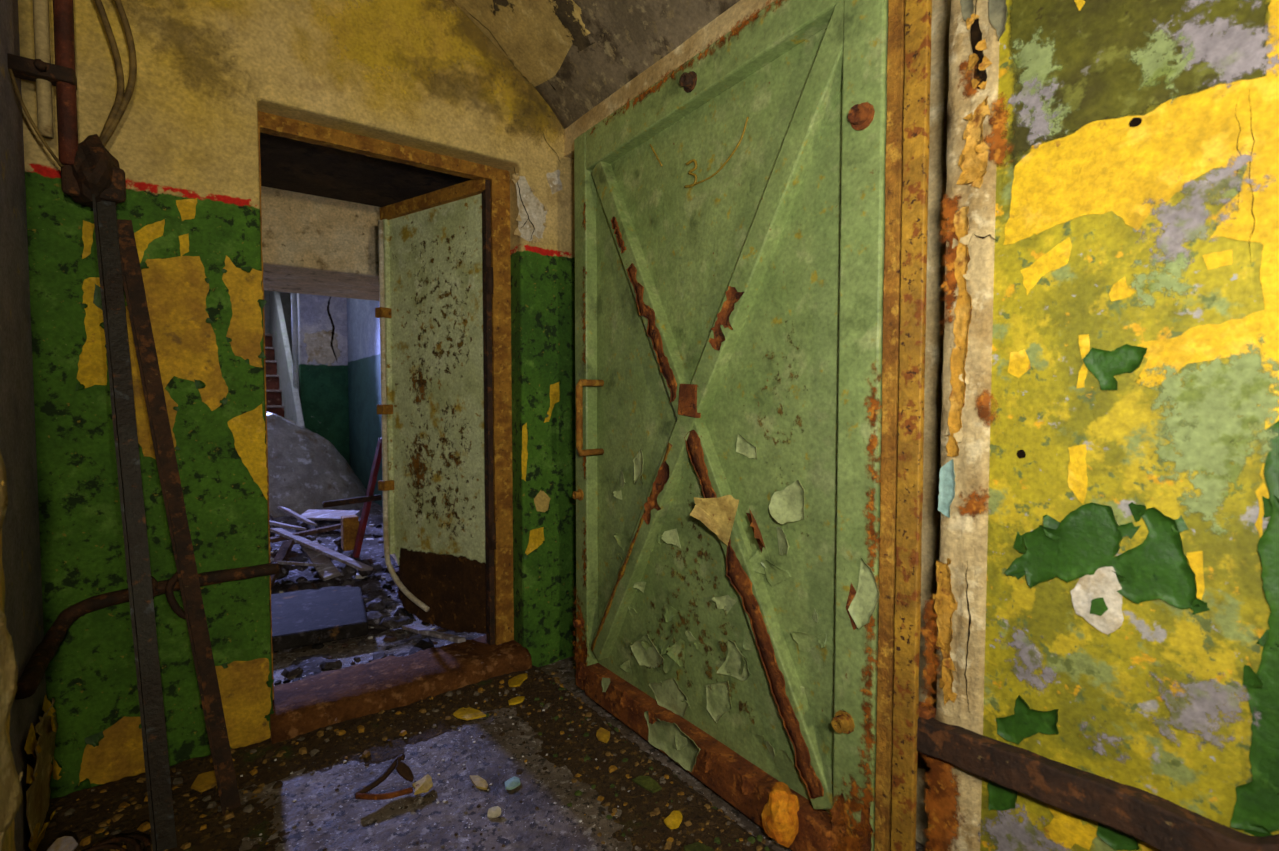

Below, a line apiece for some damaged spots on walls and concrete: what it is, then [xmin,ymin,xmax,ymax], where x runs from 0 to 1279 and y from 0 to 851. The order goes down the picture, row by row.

damp [323,0,563,133]
damp [549,0,605,53]
peeling [956,0,1007,188]
peeling [134,198,267,451]
rust [611,216,677,402]
rust [939,195,962,324]
peeling [996,0,1279,837]
rust [573,430,717,691]
peeling [690,479,805,586]
peeling [215,658,274,749]
rust [726,539,879,851]
rust [924,757,966,851]